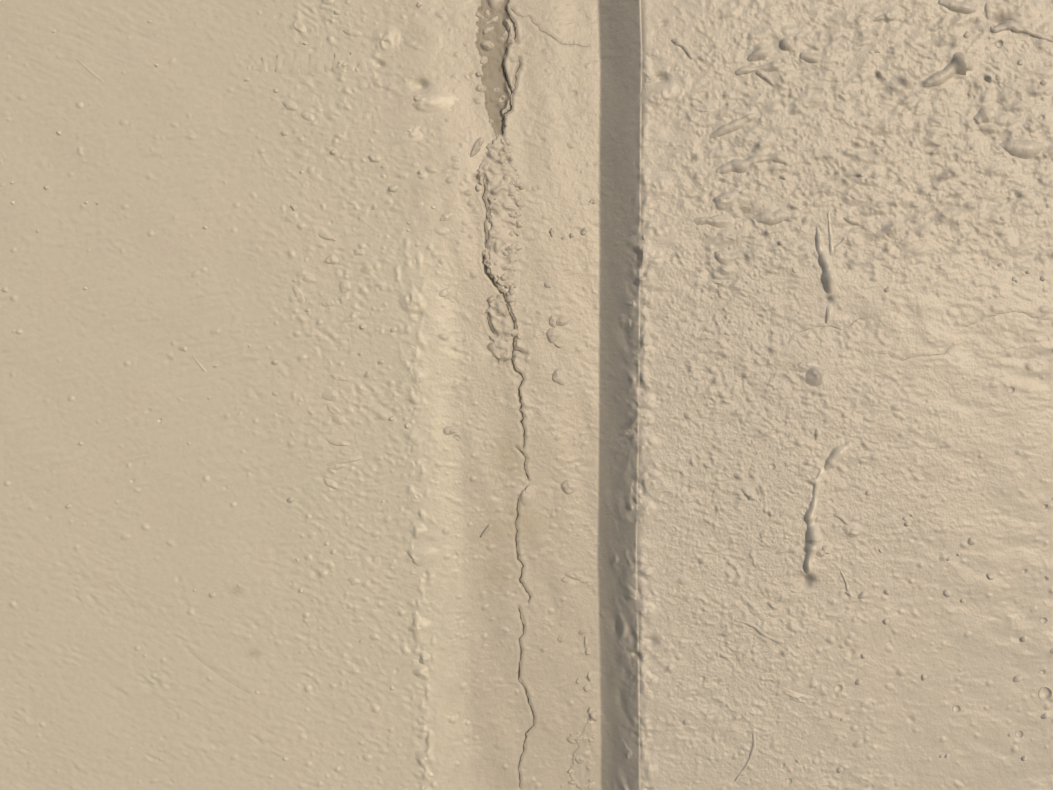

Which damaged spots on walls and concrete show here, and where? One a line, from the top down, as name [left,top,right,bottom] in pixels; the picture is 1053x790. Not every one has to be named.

crack [482,176,534,787]